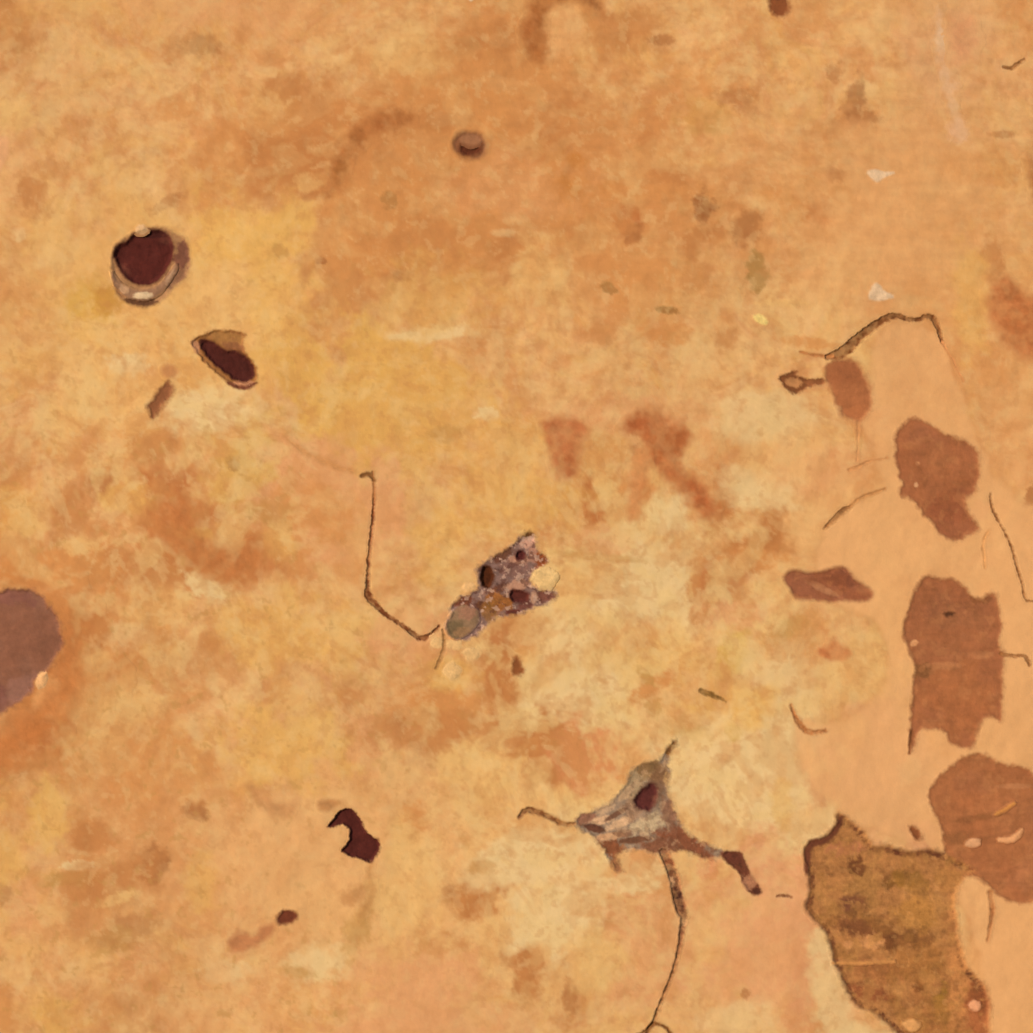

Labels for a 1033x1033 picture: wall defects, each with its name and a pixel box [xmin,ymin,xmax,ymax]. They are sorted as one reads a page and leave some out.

crack [797,311,966,384]
spalling [891,414,983,544]
spalling [0,584,68,717]
crack [358,469,447,671]
spalling [441,527,560,644]
spalling [780,563,876,606]
crack [979,491,1033,604]
spalling [799,572,1033,1033]
spalling [515,736,764,1033]